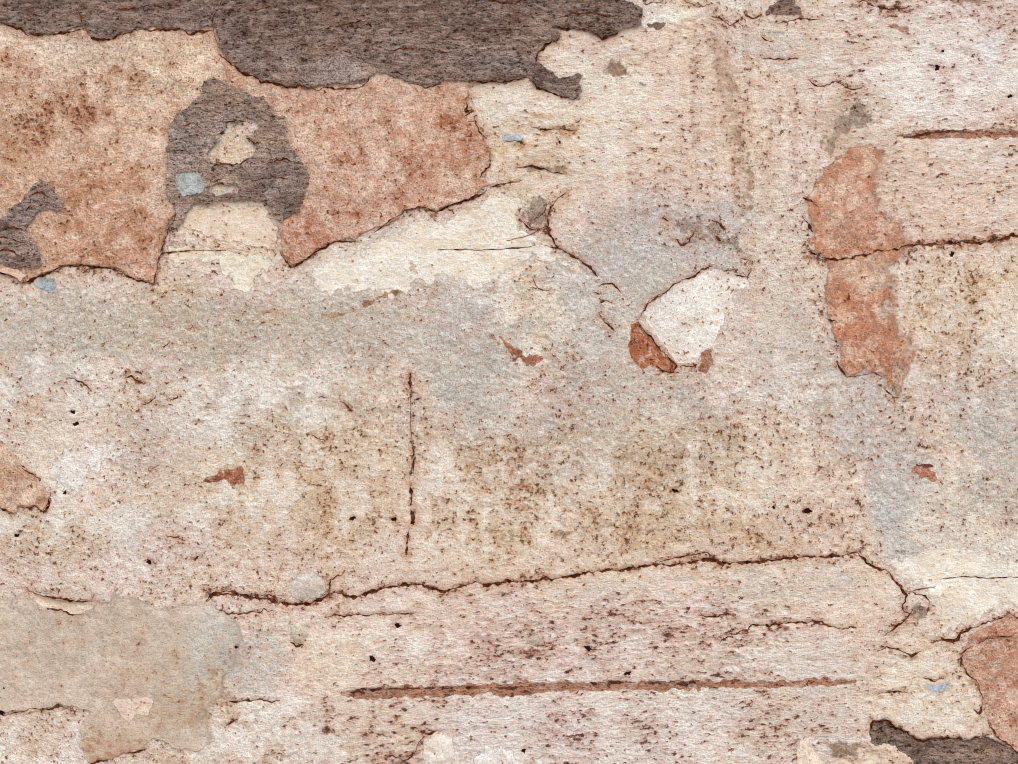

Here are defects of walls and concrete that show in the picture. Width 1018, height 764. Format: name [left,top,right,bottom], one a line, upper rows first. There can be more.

flaking render [0,0,643,300]
flaking render [48,438,123,497]
crack [405,373,420,555]
flaking render [628,269,750,372]
flaking render [807,144,918,396]
crack [836,362,898,398]
flaking render [0,588,246,764]
crack [387,731,436,763]
crack [203,552,1018,755]
flaking render [869,544,1018,764]